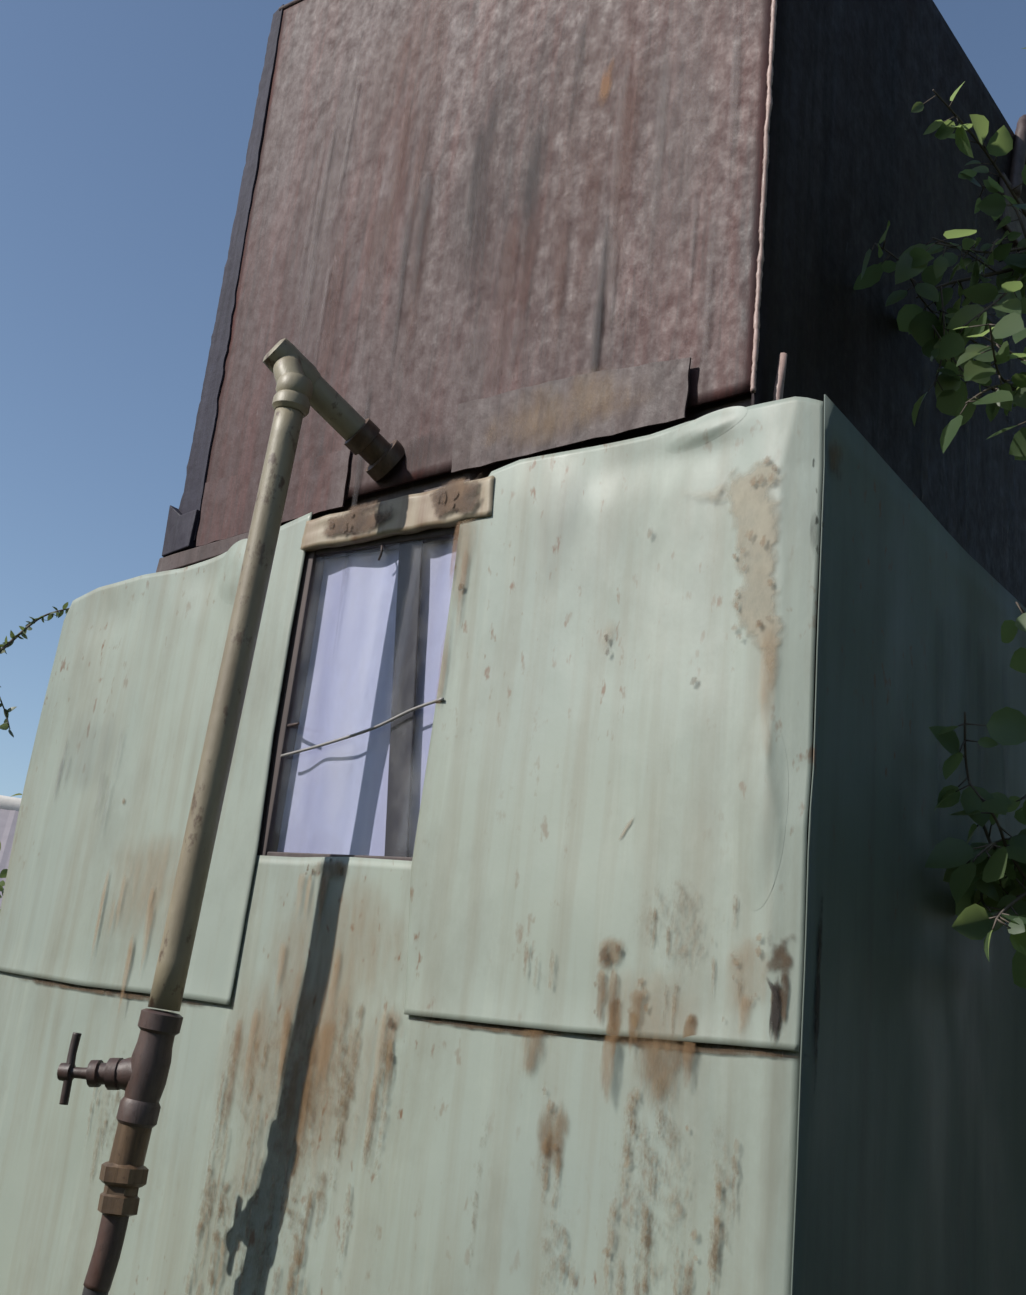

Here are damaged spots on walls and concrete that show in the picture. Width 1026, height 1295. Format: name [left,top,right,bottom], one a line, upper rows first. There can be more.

rust [324,499,390,536]
rust [431,479,479,516]
rust [596,942,784,1085]
rust [769,945,791,1020]